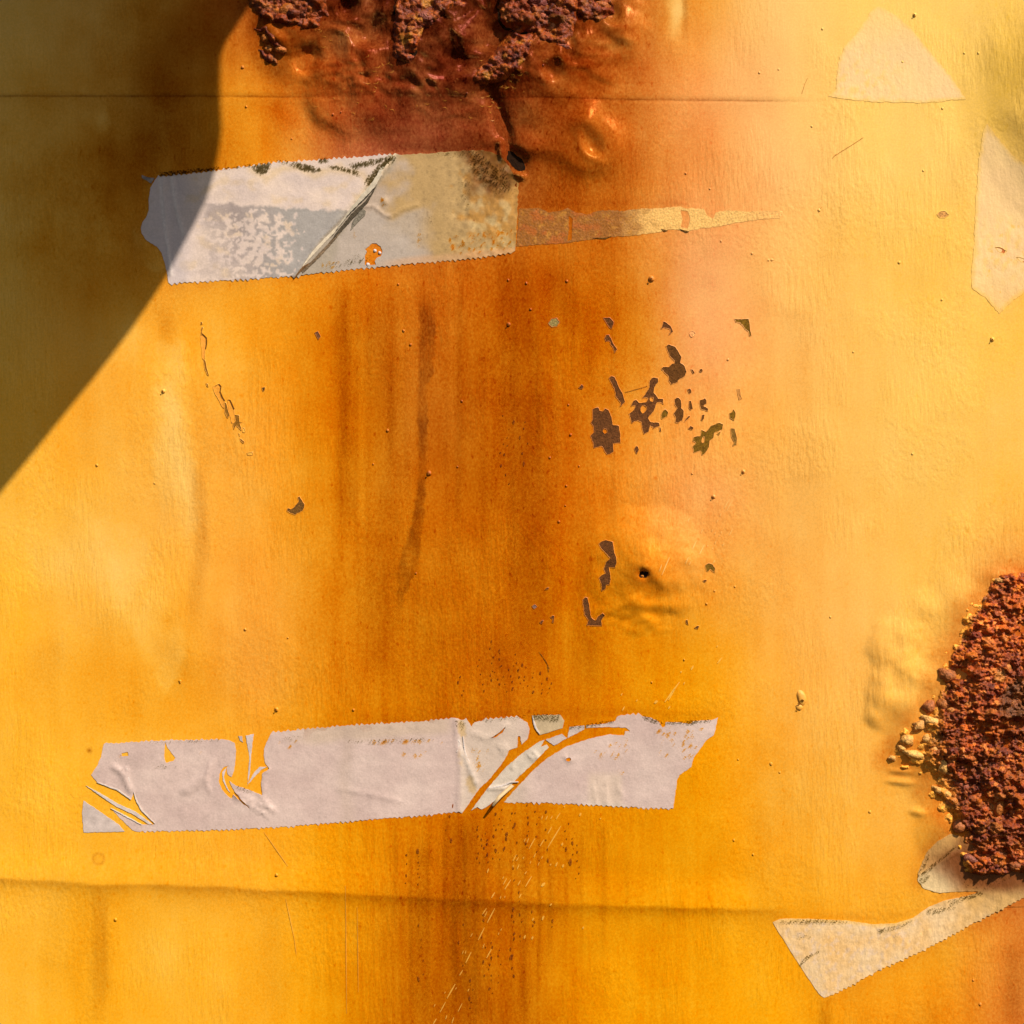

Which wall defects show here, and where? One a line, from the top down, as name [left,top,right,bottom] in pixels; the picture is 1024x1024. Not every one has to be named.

rust [238,0,666,207]
peeling [590,317,742,456]
peeling [734,318,752,337]
peeling [286,496,305,515]
rust [297,223,650,1024]
peeling [582,597,606,627]
peeling [598,540,617,592]
rust [887,572,1024,876]